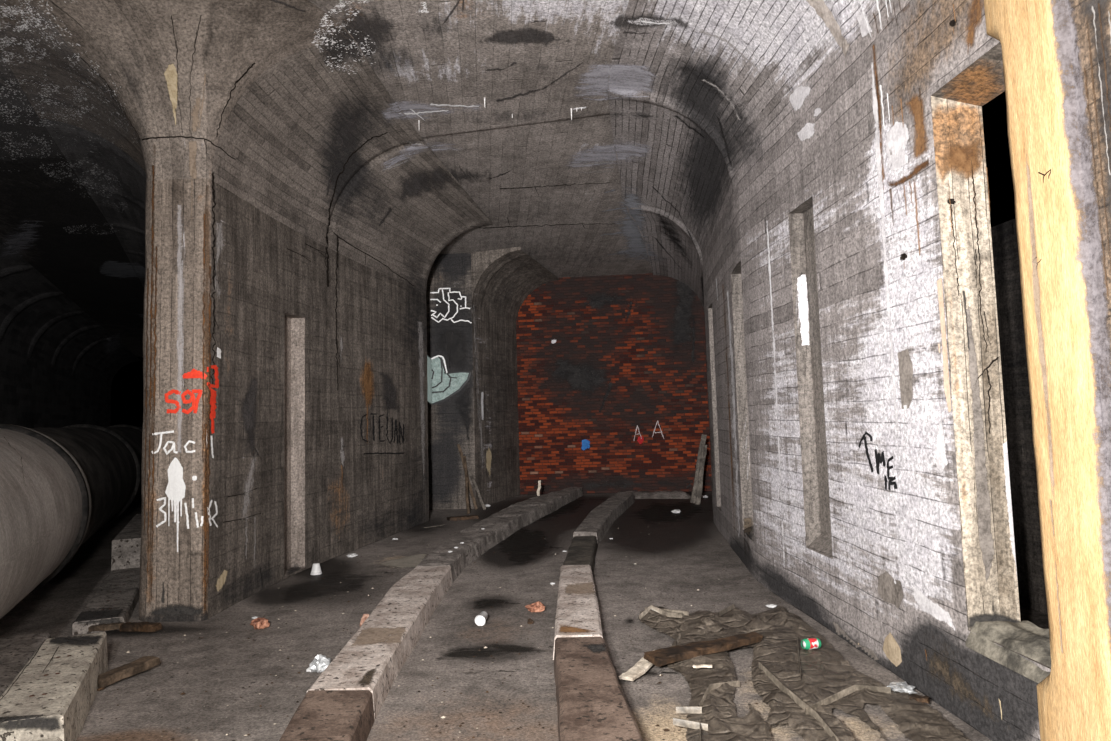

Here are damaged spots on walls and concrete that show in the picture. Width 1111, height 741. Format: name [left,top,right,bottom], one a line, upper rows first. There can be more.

rust [144,165,157,600]
crack [80,15,255,413]
crack [287,132,414,390]
water stain [322,9,393,64]
rust [872,45,929,255]
rust [944,143,990,221]